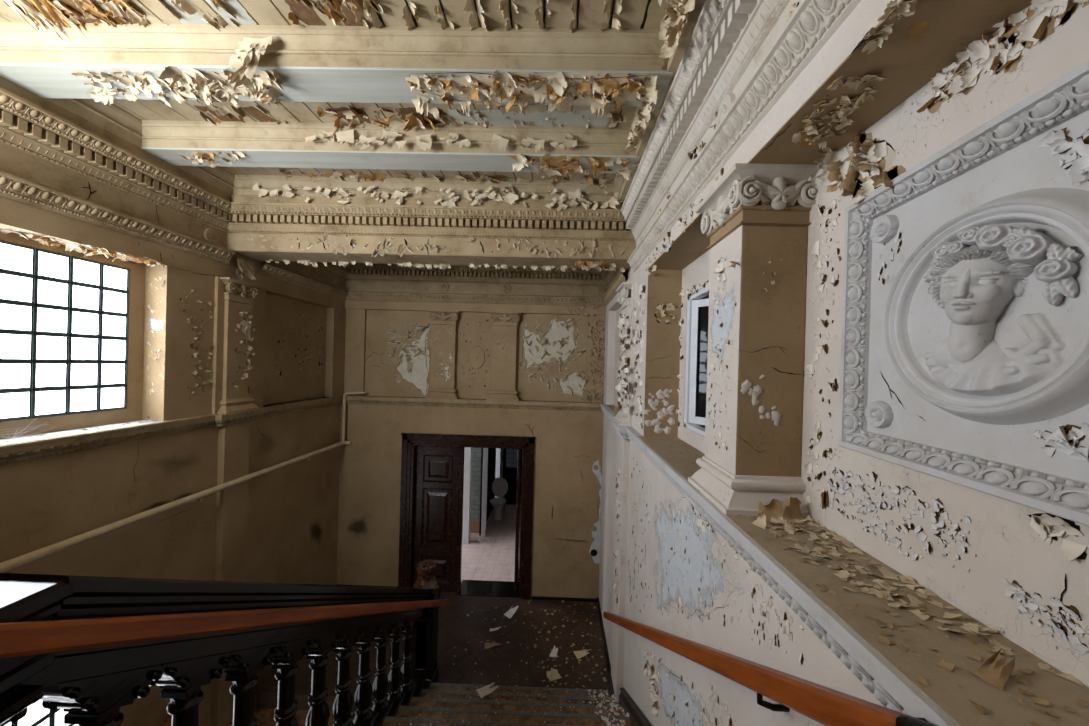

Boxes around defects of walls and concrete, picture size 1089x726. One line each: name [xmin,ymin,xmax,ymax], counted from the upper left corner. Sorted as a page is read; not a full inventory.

peeling [3,0,287,126]
peeling [180,150,245,168]
peeling [252,0,695,211]
peeling [687,141,706,160]
peeling [862,0,928,54]
peeling [911,0,1089,114]
peeling [1038,127,1089,185]
peeling [386,320,491,396]
peeling [519,192,740,450]
peeling [792,75,977,572]
peeling [613,458,804,654]
peeling [1003,579,1089,655]